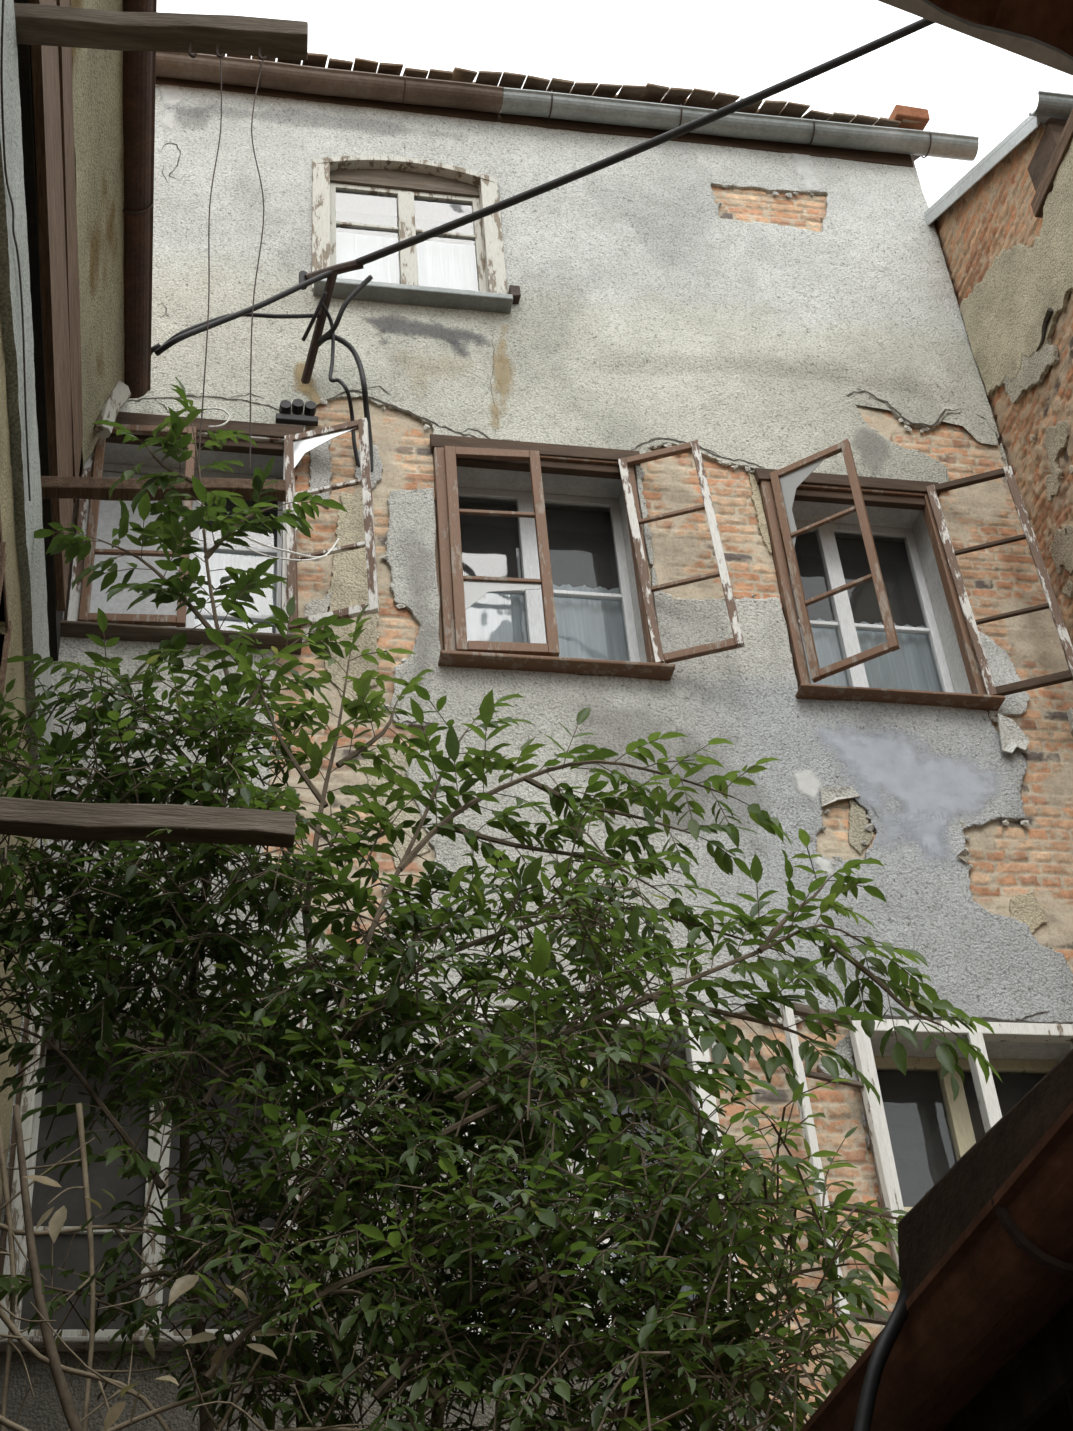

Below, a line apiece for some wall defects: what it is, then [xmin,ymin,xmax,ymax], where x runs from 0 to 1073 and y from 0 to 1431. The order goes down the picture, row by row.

spalling [711,181,827,232]
flaking render [960,139,1073,404]
crack [848,388,957,431]
spalling [635,442,782,607]
spalling [263,393,441,947]
spalling [847,396,1073,1002]
spalling [810,787,876,866]